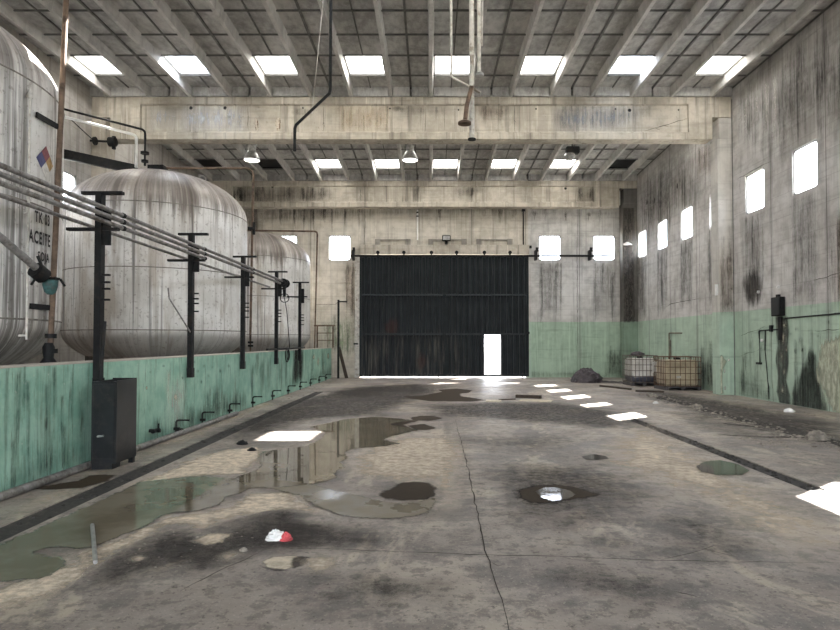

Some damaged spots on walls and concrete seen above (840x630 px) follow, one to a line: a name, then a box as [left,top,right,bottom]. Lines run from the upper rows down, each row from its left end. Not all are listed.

damp [792,349,826,410]
crack [423,420,541,630]
crack [563,544,732,562]